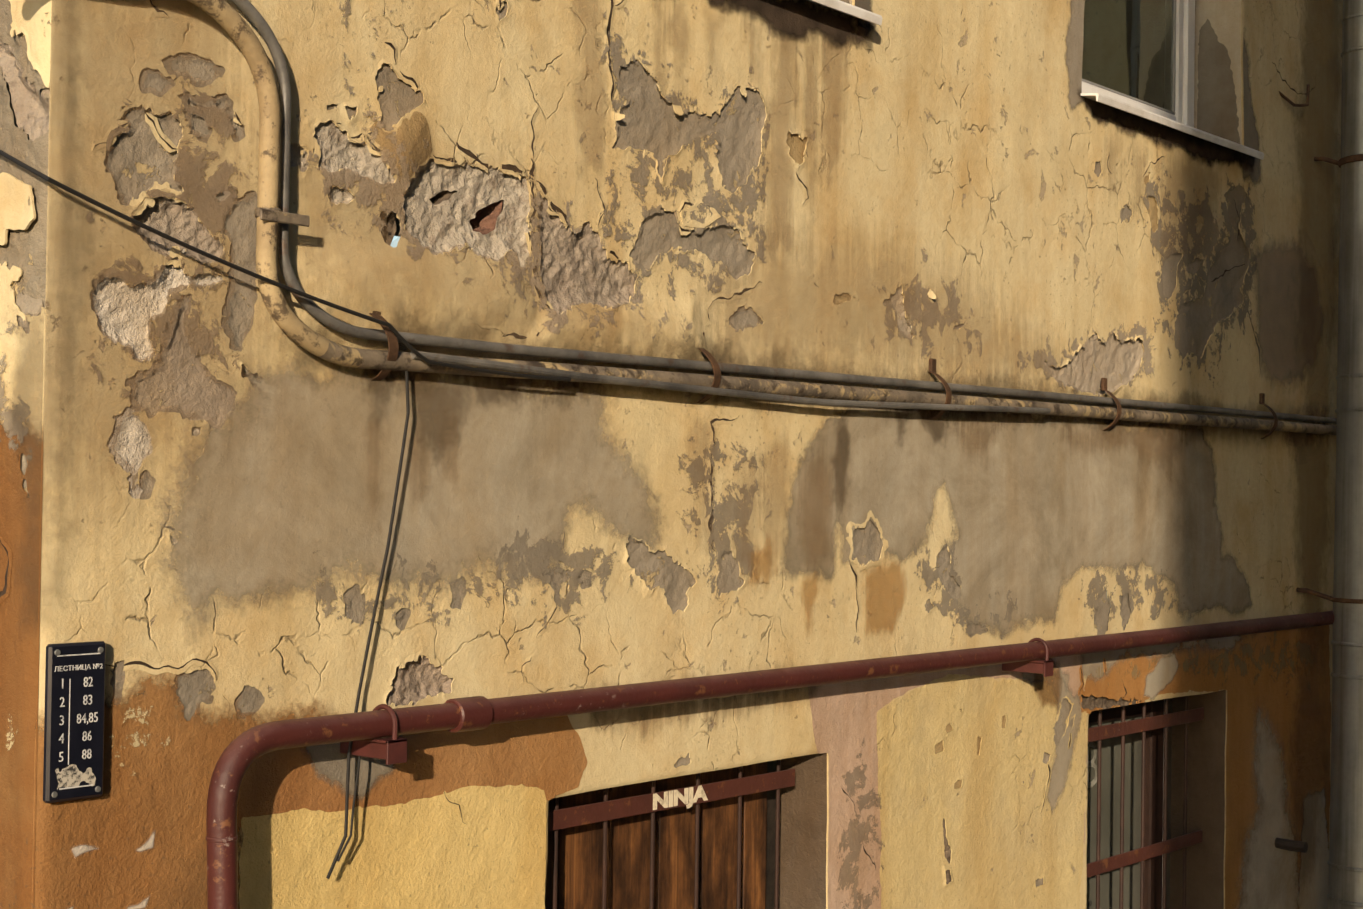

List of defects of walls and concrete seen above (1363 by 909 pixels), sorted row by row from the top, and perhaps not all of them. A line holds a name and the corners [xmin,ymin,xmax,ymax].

crack [604,0,627,111]
spalling [0,0,50,335]
spalling [290,0,813,348]
peeling [82,52,276,500]
peeling [1012,156,1265,404]
flaking render [0,353,32,498]
peeling [846,510,888,571]
peeling [913,529,1018,639]
flaking render [1078,563,1194,635]
leakage [592,686,816,726]
flaking render [837,740,885,909]
spalling [939,808,955,889]